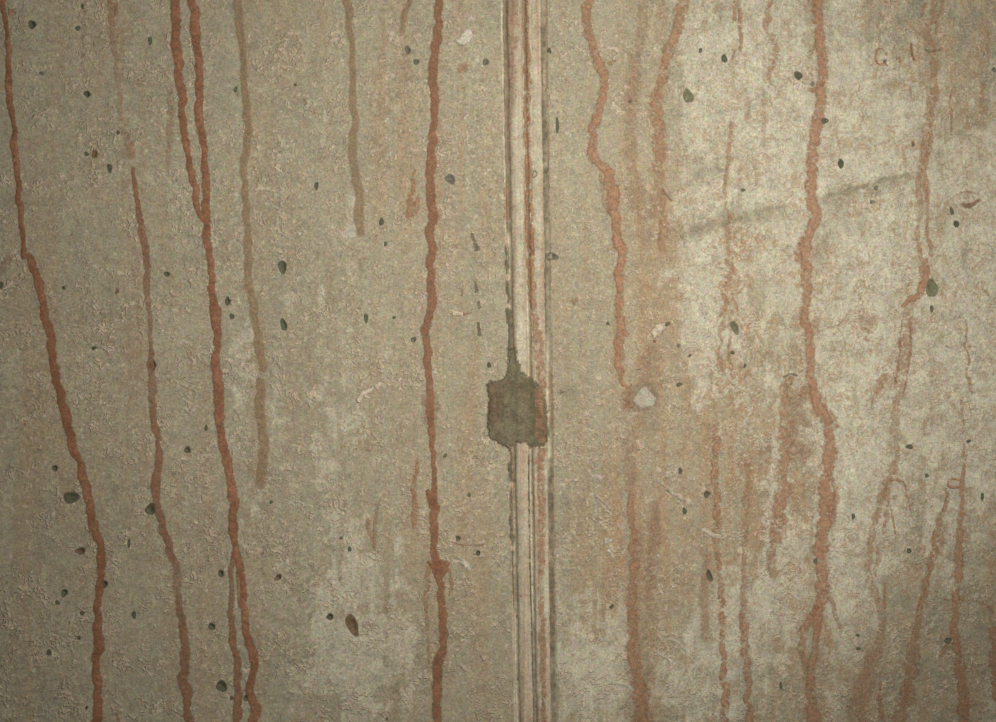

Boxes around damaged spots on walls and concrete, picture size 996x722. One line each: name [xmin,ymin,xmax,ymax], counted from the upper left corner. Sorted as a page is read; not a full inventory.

corrosion [0,0,106,722]
corrosion [132,169,150,258]
corrosion [150,405,175,560]
corrosion [170,0,261,722]
corrosion [235,7,269,479]
corrosion [407,0,453,722]
water stain [487,347,551,448]
corrosion [582,0,633,408]
corrosion [627,495,650,722]
corrosion [651,1,689,162]
corrosion [795,0,838,722]
corrosion [902,224,933,307]